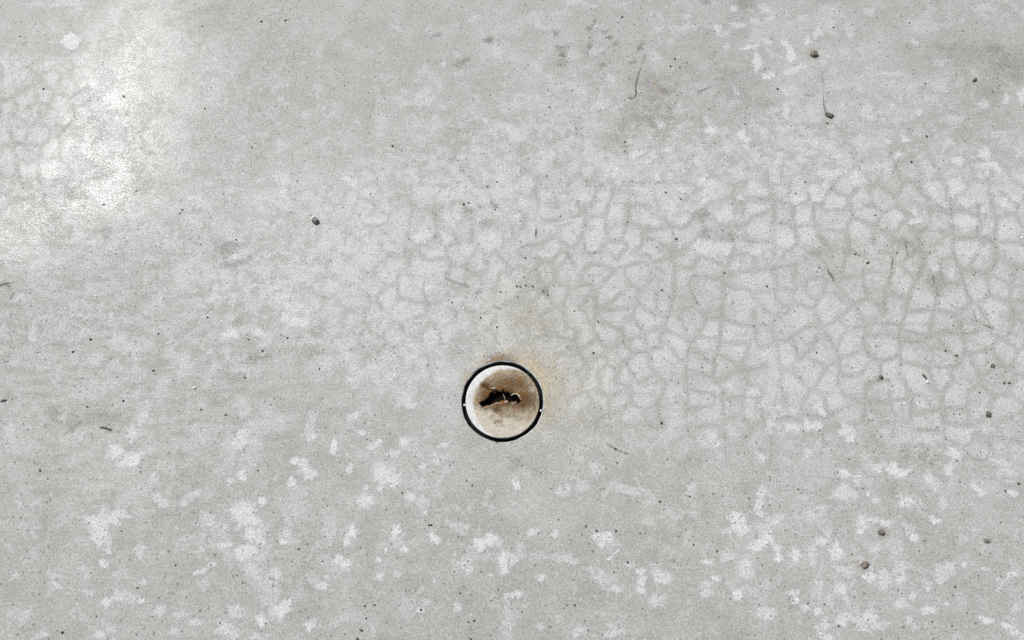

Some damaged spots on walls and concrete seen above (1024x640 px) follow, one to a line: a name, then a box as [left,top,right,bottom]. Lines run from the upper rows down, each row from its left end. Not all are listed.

rust [455,264,625,485]